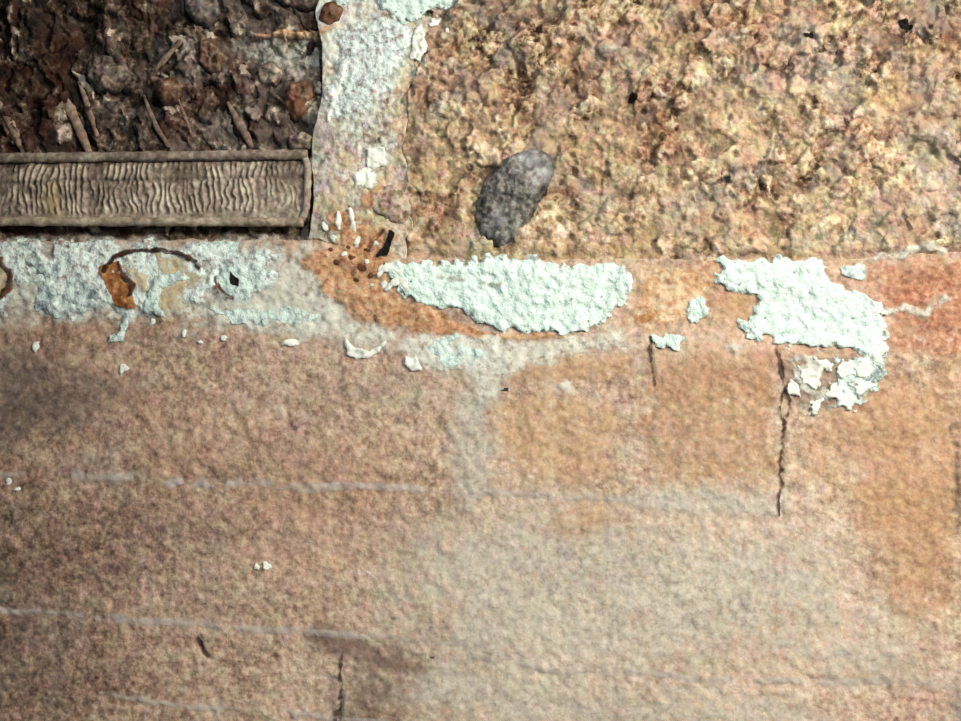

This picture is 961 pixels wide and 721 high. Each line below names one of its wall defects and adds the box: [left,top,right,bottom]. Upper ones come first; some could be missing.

spalling [0,256,13,300]
spalling [98,247,201,324]
peeling [377,263,409,291]
rust [299,184,573,341]
peeling [714,254,890,415]
crack [776,349,792,516]
crack [334,656,343,721]